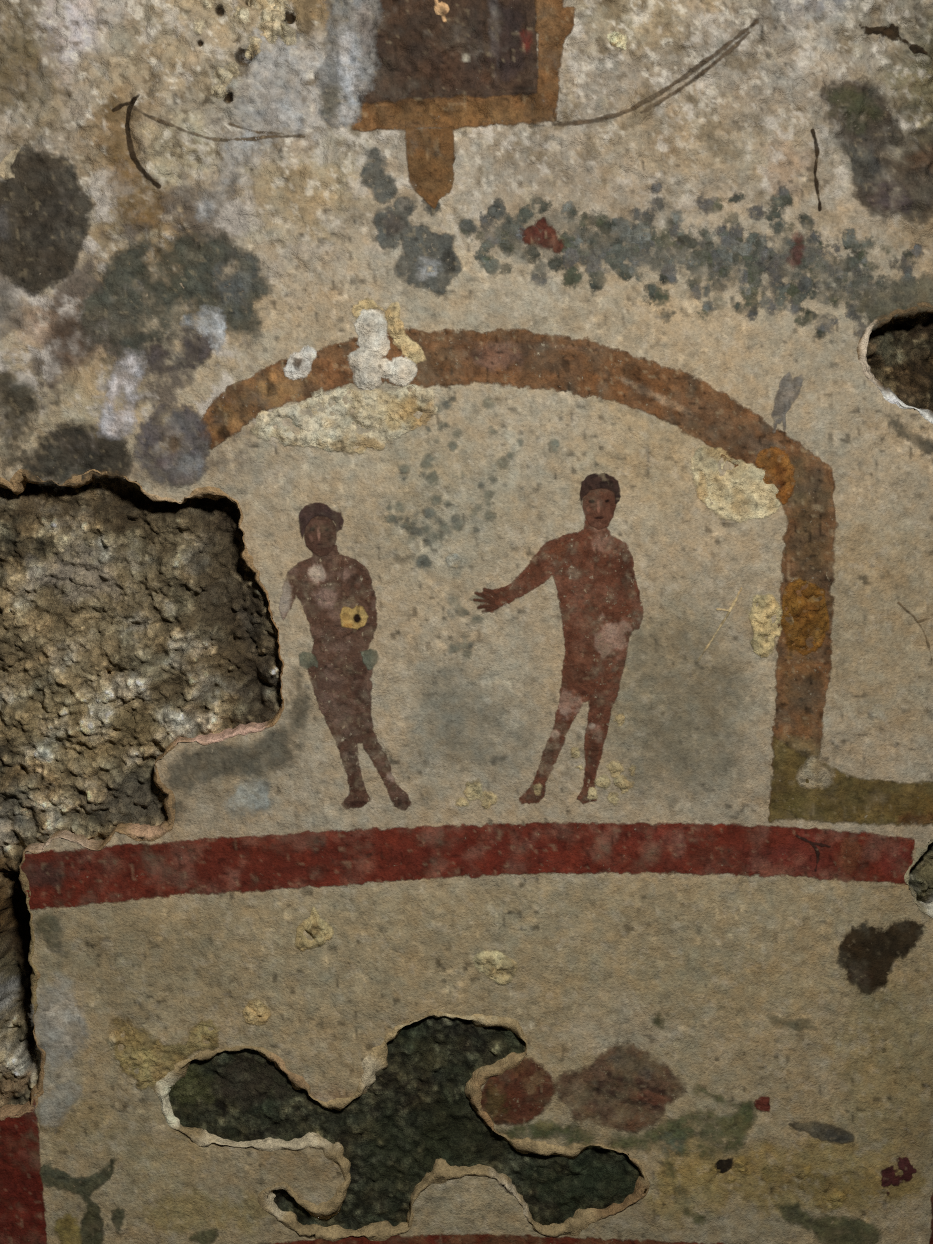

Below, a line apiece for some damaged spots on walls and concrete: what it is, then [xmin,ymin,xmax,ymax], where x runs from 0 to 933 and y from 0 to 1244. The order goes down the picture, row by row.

peeling [194,0,296,103]
water stain [198,34,303,218]
water stain [821,81,933,223]
water stain [0,233,270,486]
flaking render [857,302,933,424]
flaking render [0,469,285,1121]
flaking render [904,839,933,919]
flaking render [106,1010,650,1242]